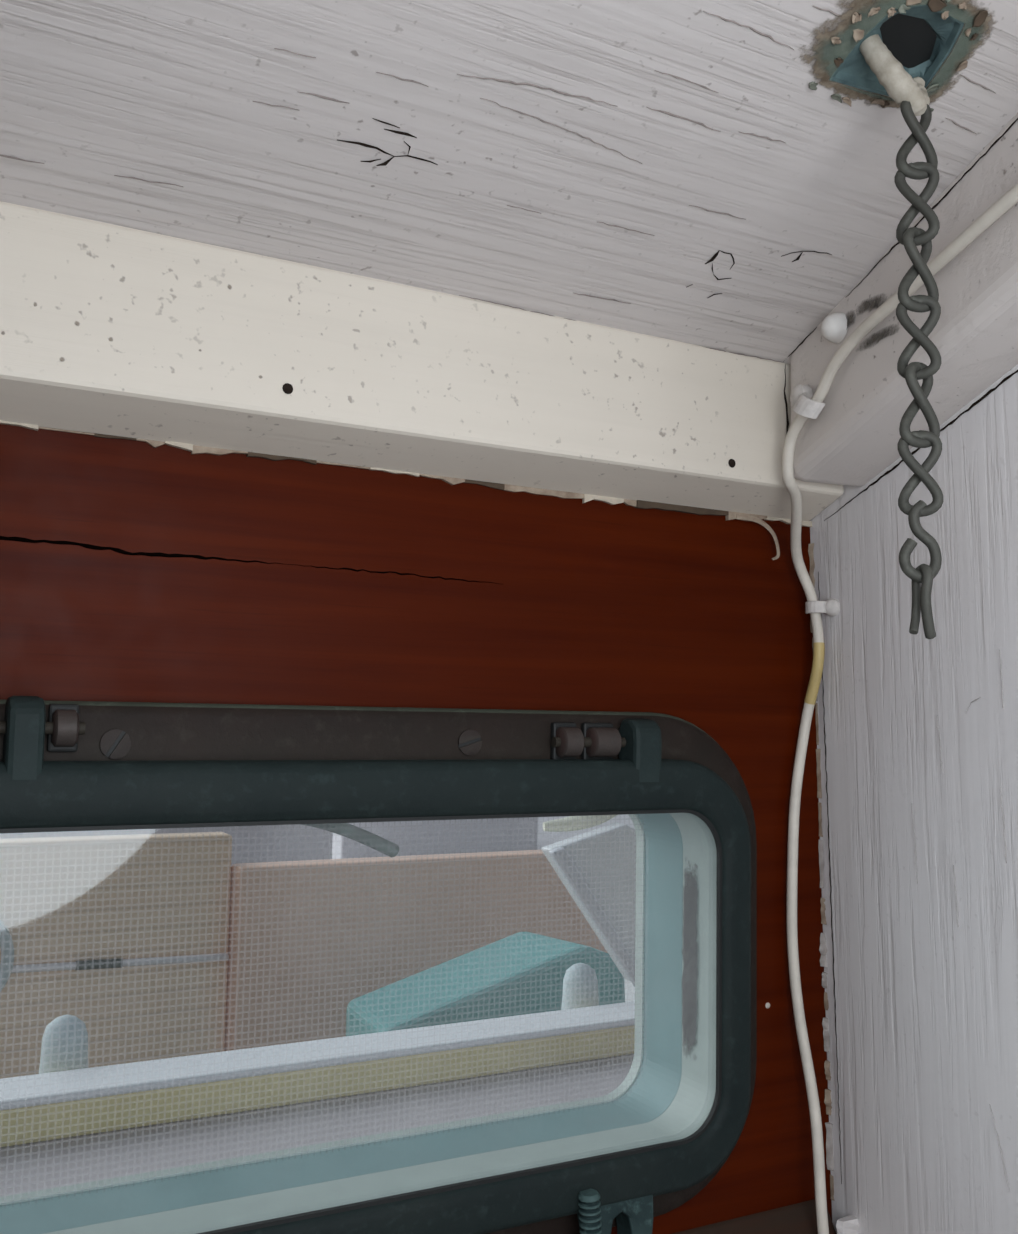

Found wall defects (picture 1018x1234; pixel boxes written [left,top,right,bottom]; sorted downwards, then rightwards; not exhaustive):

crack [274,48,316,58]
peeling [800,0,996,112]
crack [253,91,438,166]
crack [0,536,498,584]